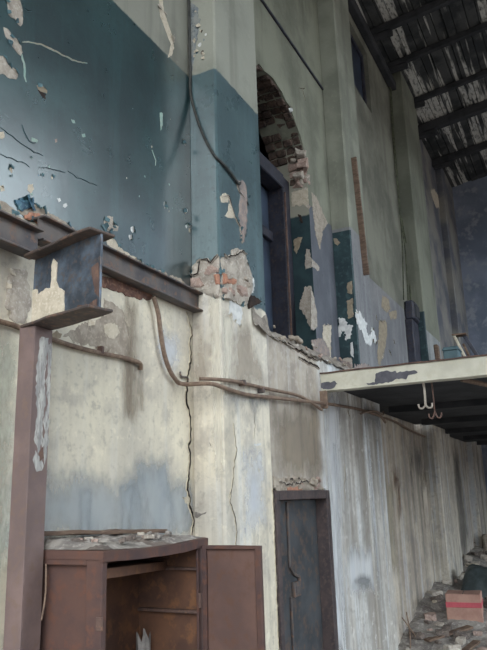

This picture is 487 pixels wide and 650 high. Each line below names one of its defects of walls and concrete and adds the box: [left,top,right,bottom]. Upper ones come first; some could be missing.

peeling [0,27,27,82]
peeling [158,0,175,57]
crack [0,125,97,186]
flaking render [290,148,328,249]
flaking render [4,268,32,324]
flaking render [102,180,417,385]
crack [182,311,206,535]
leakage [44,463,192,537]
crack [228,423,237,545]
flaking render [273,475,324,491]
leakage [380,483,397,565]
leakage [456,462,467,549]